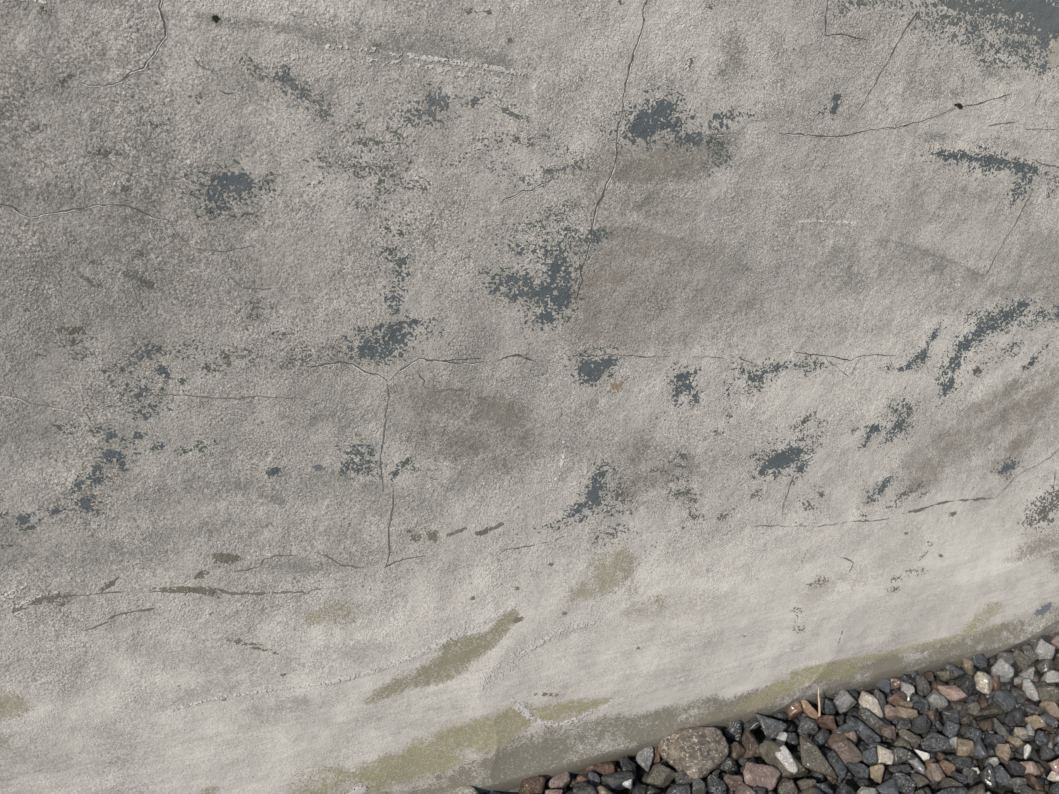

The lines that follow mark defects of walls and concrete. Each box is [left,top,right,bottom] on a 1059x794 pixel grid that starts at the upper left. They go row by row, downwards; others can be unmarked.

crack [84,0,167,87]
crack [575,1,647,300]
peeling [600,80,754,176]
crack [696,12,1056,139]
peeling [913,143,1059,209]
peeling [0,53,615,548]
peeling [880,294,1059,407]
crack [0,354,535,631]
peeling [516,459,637,553]
peeling [748,408,830,512]
crack [722,449,1059,573]
damp [88,630,398,725]